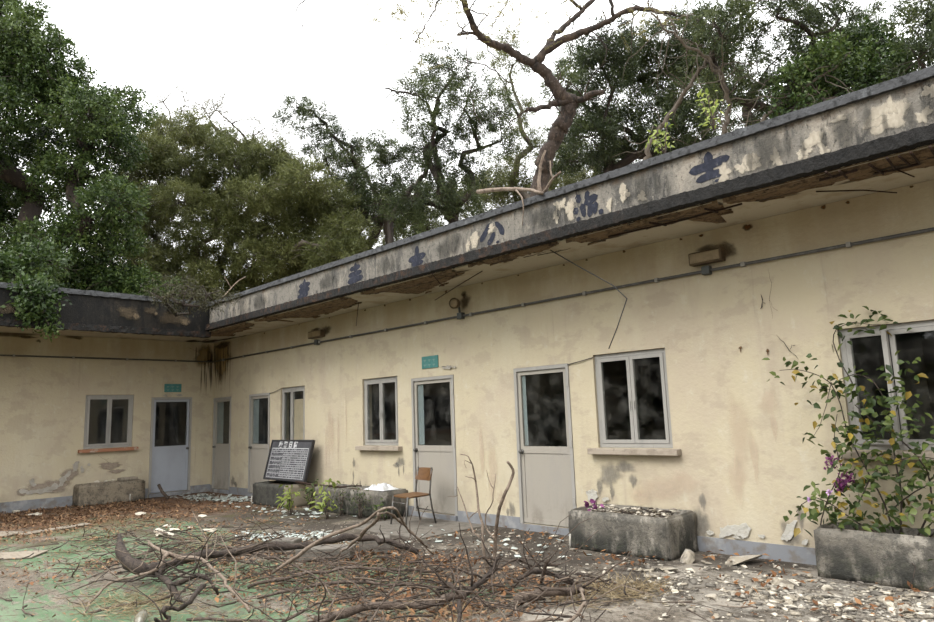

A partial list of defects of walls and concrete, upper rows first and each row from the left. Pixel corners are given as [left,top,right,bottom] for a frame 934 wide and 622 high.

peeling [864,84,934,135]
peeling [796,130,831,160]
spalling [211,144,934,336]
damp [187,335,247,387]
damp [598,463,636,496]